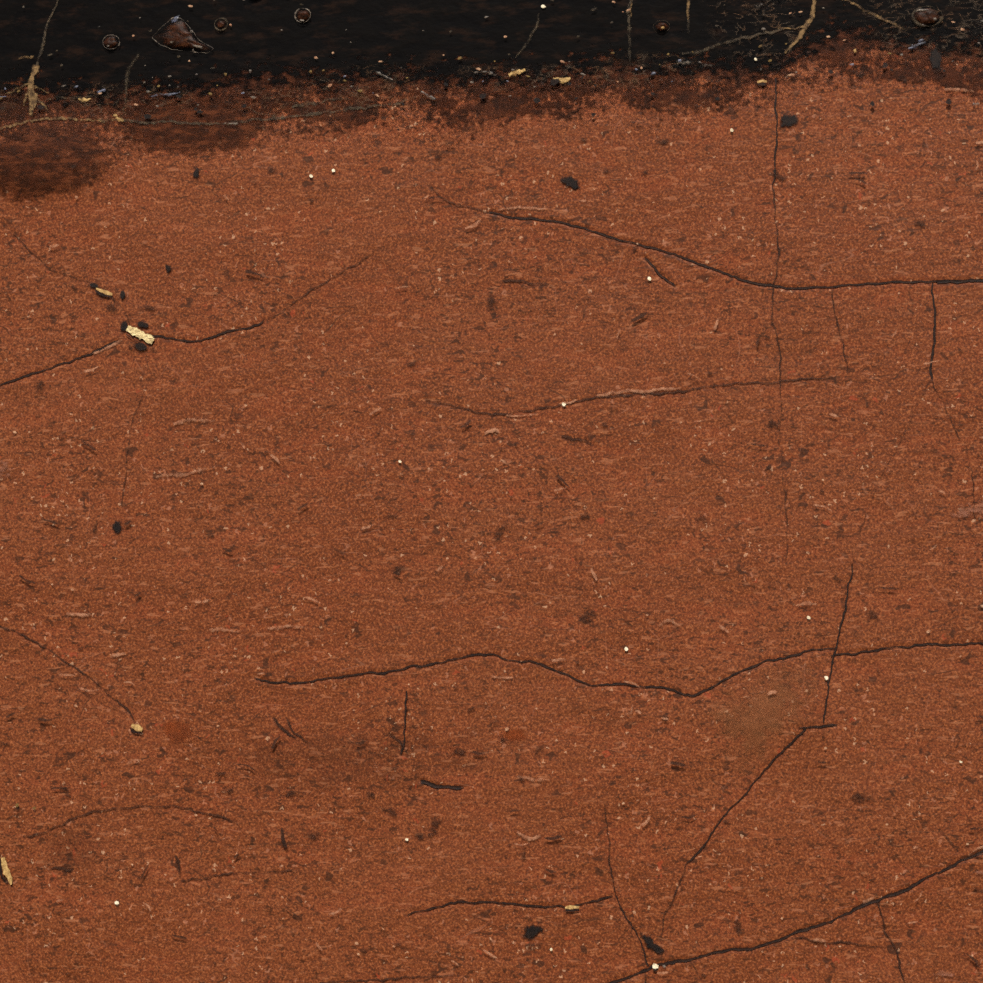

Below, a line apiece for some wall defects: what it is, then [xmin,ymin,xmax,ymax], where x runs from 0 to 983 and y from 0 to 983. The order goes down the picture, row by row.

crack [625,0,633,30]
crack [691,0,816,54]
crack [851,2,901,28]
damp [0,27,983,201]
crack [426,78,983,435]
crack [152,255,370,342]
crack [0,340,119,385]
crack [0,625,134,720]
crack [255,563,983,983]
crack [23,805,238,837]
crack [181,869,299,882]